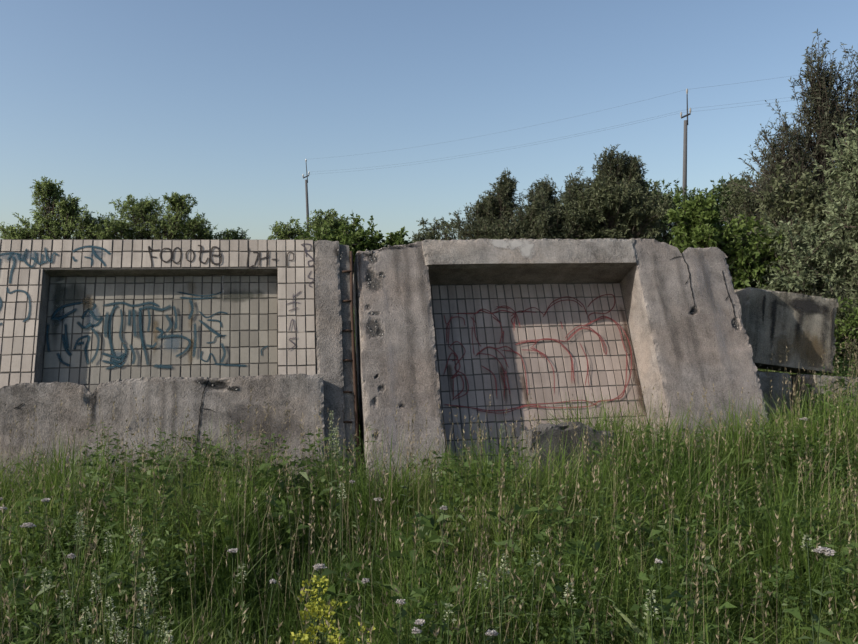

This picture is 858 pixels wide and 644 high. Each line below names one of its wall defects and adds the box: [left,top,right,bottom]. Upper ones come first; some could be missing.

crack [670,253,695,308]
crack [722,270,735,316]
spalling [367,305,384,336]
water stain [762,295,834,349]
crack [188,377,226,456]